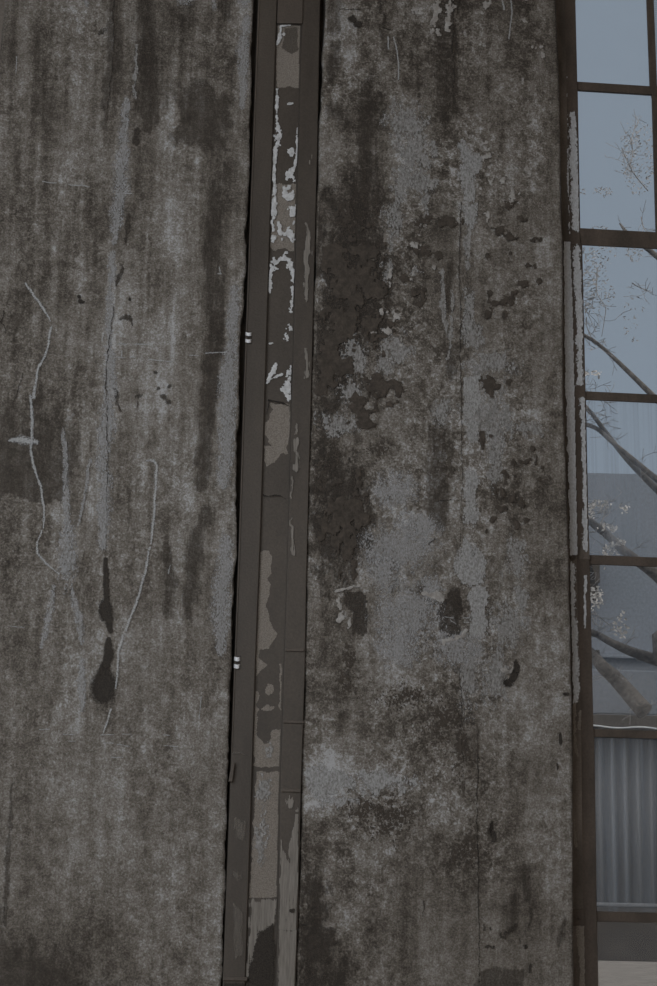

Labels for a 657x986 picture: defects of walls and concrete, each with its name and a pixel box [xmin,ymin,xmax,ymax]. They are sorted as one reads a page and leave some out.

damp [40,44,139,712]
peeling [268,24,313,344]
damp [313,95,544,495]
peeling [256,550,277,676]
damp [308,458,532,720]
peeling [233,664,299,986]
damp [299,869,338,986]
damp [305,762,423,811]